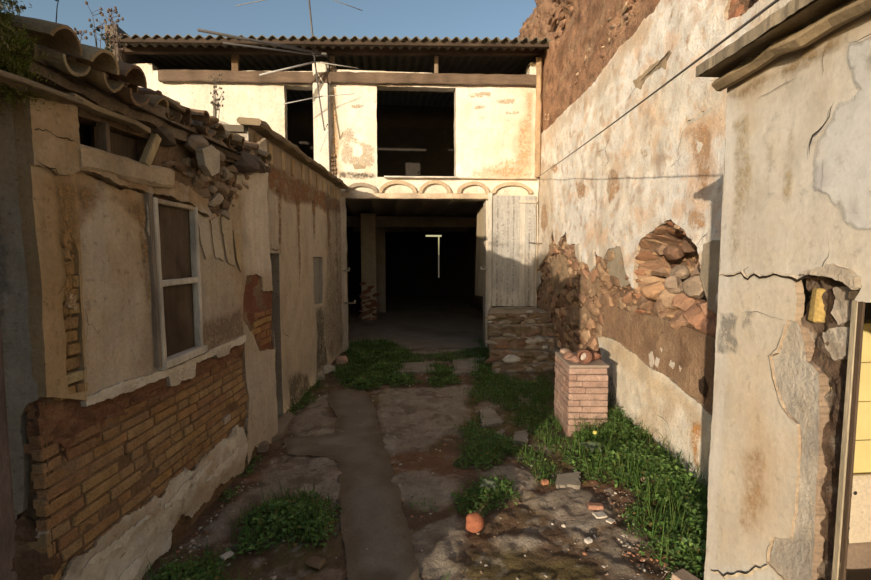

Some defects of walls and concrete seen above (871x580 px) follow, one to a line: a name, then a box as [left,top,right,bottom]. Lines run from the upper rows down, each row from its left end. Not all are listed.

spalling [148,126,266,272]
flaking render [243,274,273,350]
flaking render [330,131,374,176]
flaking render [492,195,717,410]
crack [719,239,829,282]
crack [809,104,833,152]
flaking render [814,39,871,229]
flaking render [11,241,248,580]
flaking render [801,276,862,580]